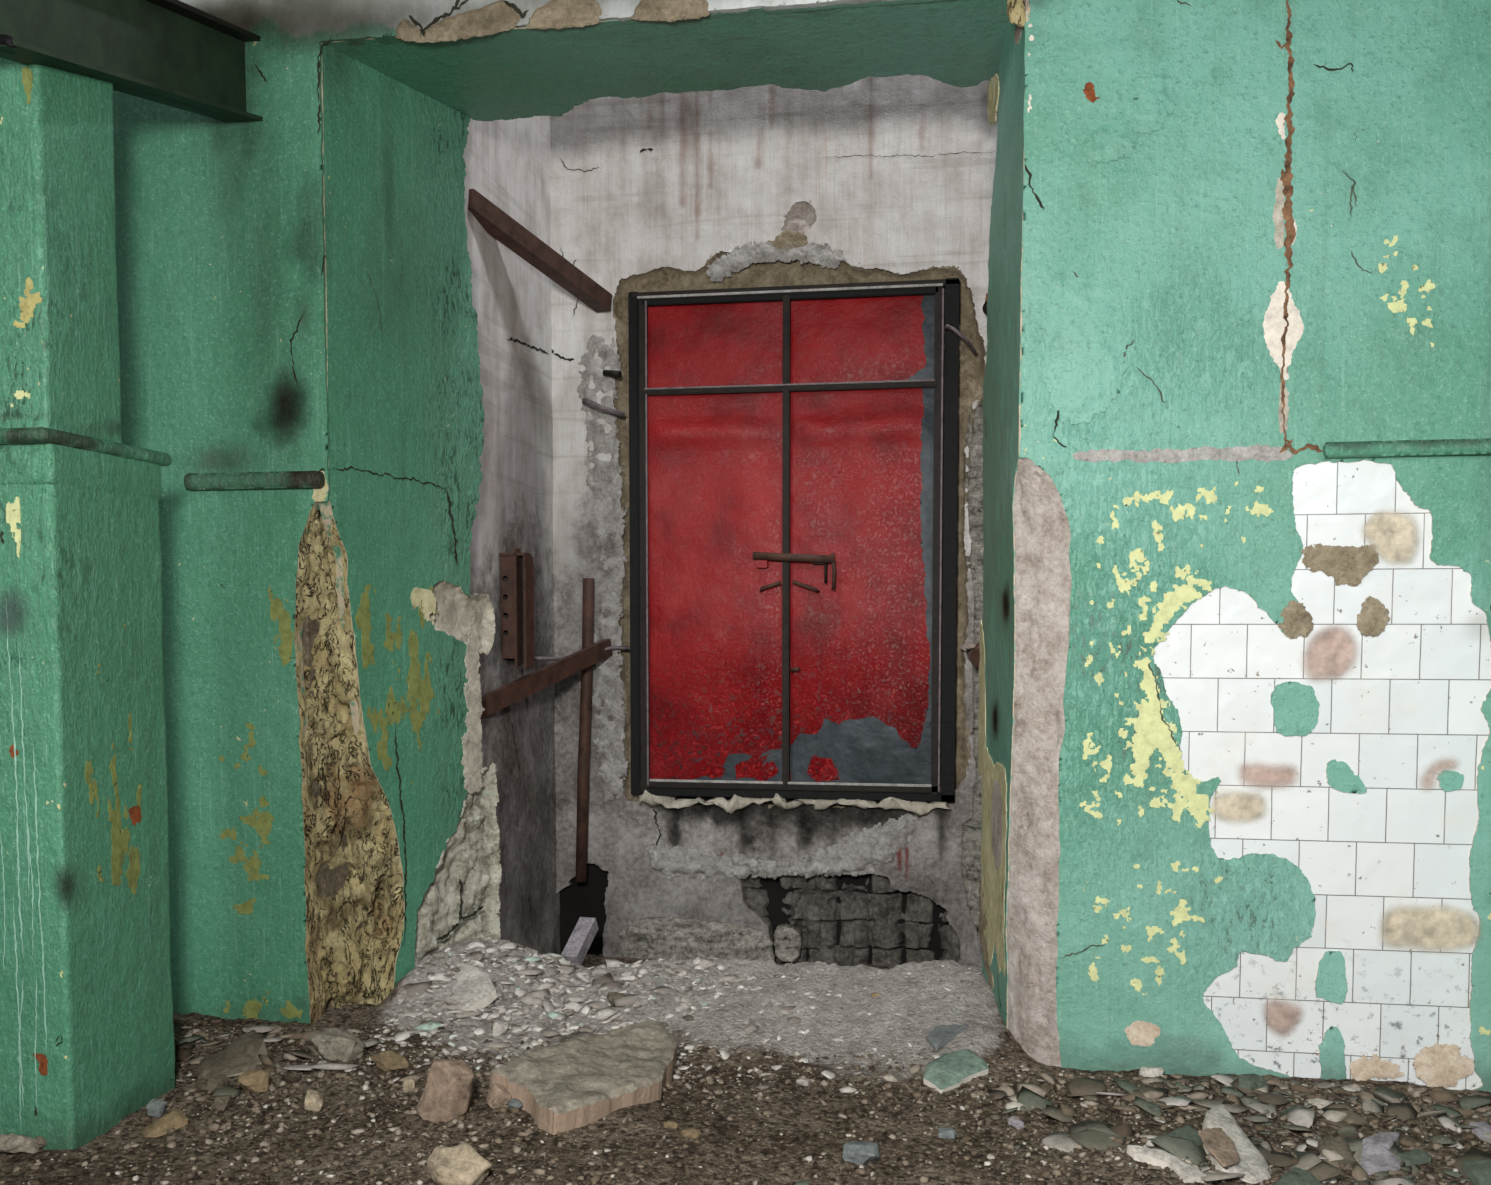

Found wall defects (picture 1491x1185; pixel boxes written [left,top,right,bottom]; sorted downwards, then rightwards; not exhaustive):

spalling [395,0,602,43]
spalling [629,0,710,22]
crack [1263,0,1353,455]
crack [1342,170,1357,214]
crack [319,466,458,566]
flaking render [576,200,1491,1090]
spalling [219,470,502,1024]